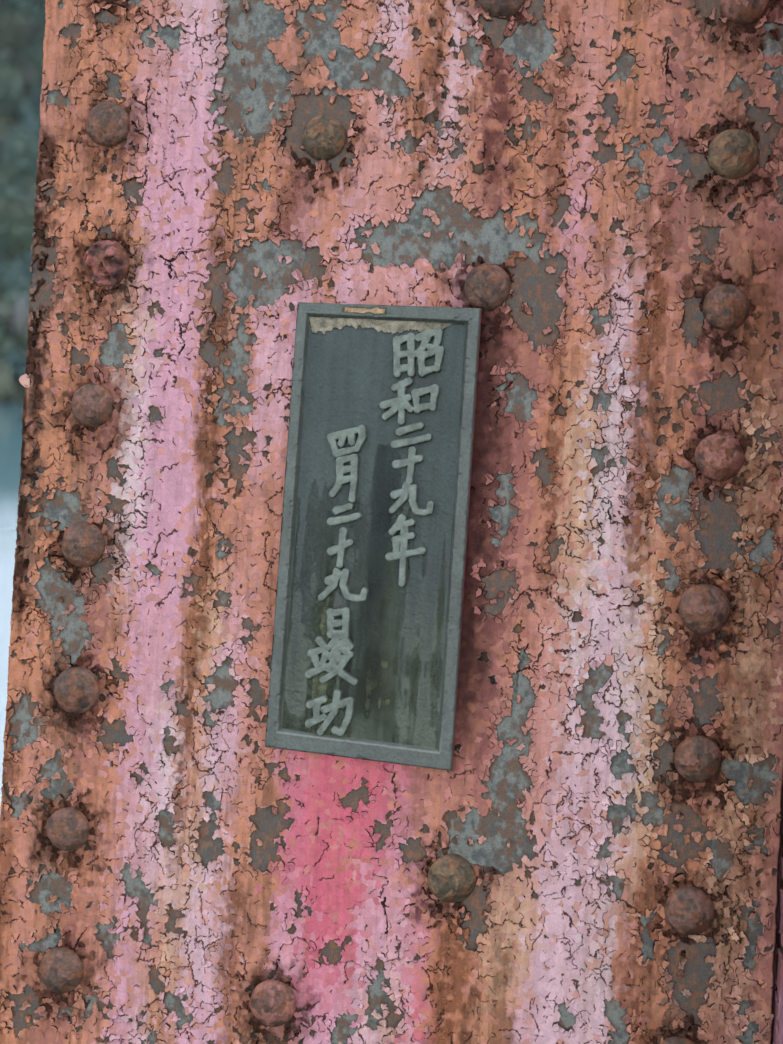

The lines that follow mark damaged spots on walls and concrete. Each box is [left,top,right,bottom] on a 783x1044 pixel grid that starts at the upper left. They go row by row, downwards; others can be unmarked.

crack [144,79,152,151]
peeling [205,0,422,180]
crack [159,252,188,279]
rust [673,421,753,501]
peeling [27,450,272,794]
rust [661,569,743,664]
rust [660,713,735,810]
rust [32,796,96,876]
peeling [150,780,230,878]
peeling [563,643,780,1044]
peeling [0,858,198,1044]
rust [651,870,735,957]